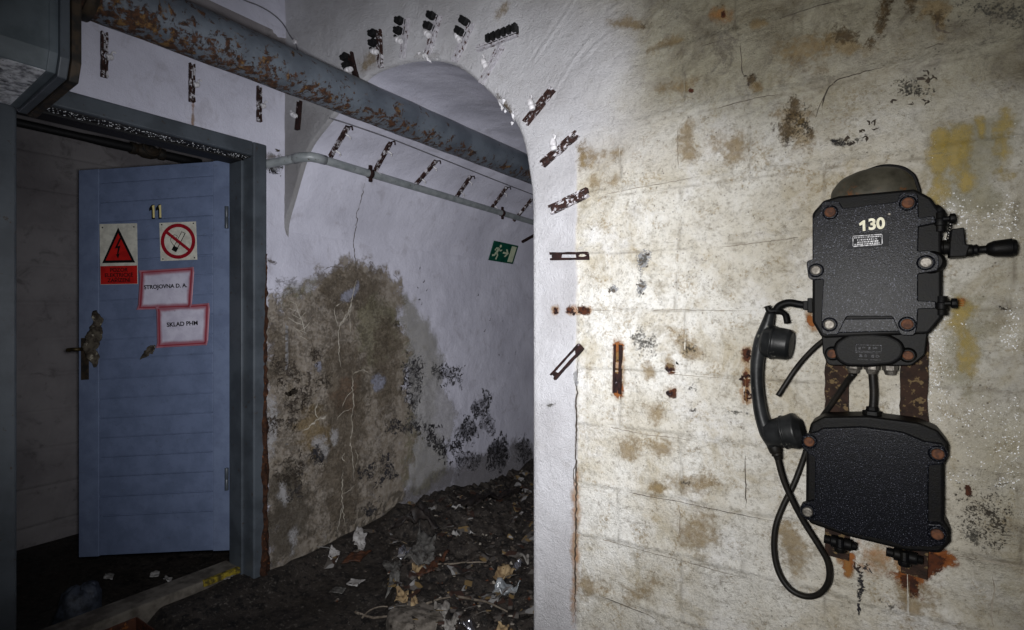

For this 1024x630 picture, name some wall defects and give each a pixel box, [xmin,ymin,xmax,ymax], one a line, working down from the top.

crack [816,67,882,116]
water stain [890,70,937,106]
water stain [771,94,814,146]
water stain [928,109,1012,205]
crack [353,177,366,282]
corrosion [552,305,591,316]
corrosion [260,254,270,576]
water stain [266,256,418,570]
corrosion [837,553,856,577]
corrosion [889,549,959,598]